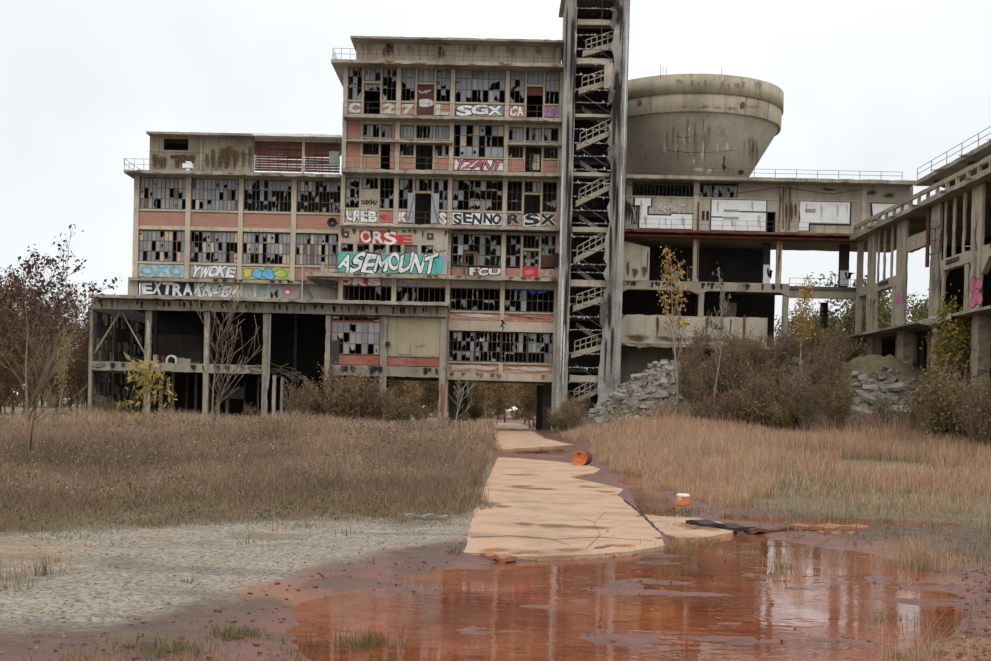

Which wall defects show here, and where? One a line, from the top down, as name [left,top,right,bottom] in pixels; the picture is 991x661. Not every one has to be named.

damp [152,147,252,167]
damp [693,142,728,173]